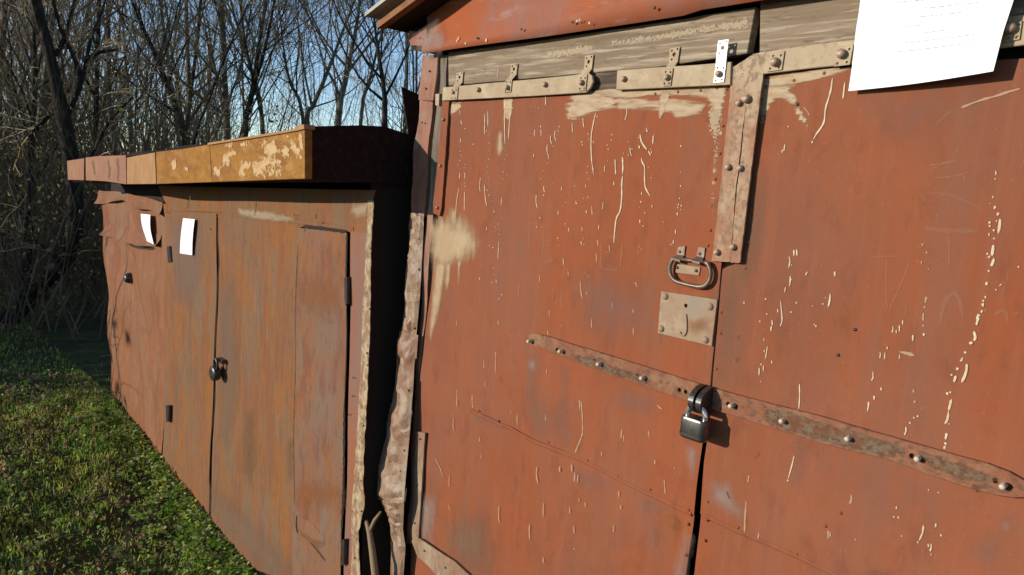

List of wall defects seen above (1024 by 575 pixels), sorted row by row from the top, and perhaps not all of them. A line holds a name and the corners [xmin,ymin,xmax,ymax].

peeling [503,97,513,119]
peeling [213,133,303,179]
peeling [567,86,728,184]
peeling [431,219,475,267]
rust [575,355,649,384]
rust [765,410,905,457]
rust [922,453,992,491]